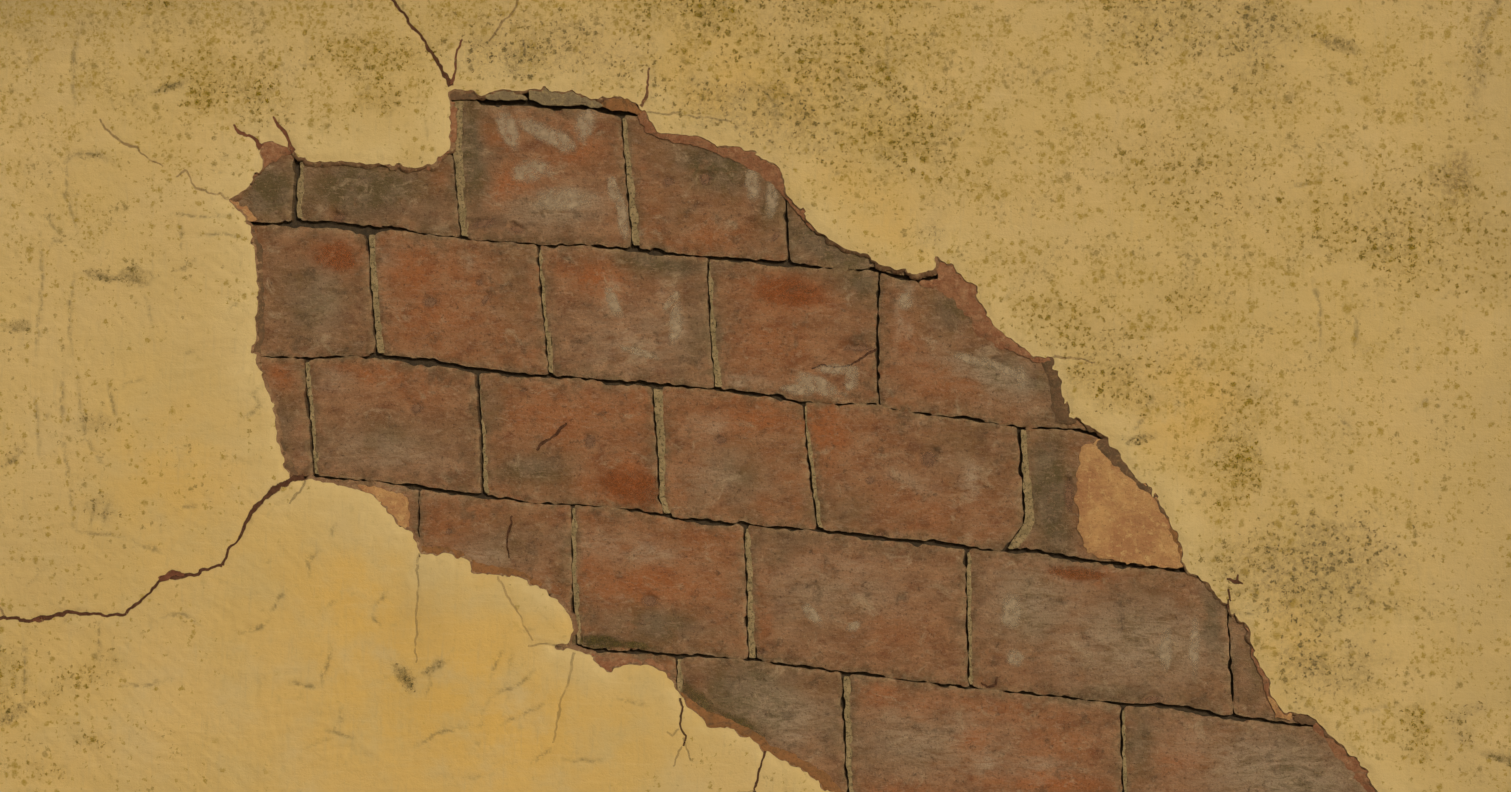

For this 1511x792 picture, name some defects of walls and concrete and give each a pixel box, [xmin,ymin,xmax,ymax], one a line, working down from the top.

crack [391,0,463,87]
flaking render [230,87,1375,792]
crack [0,474,305,623]